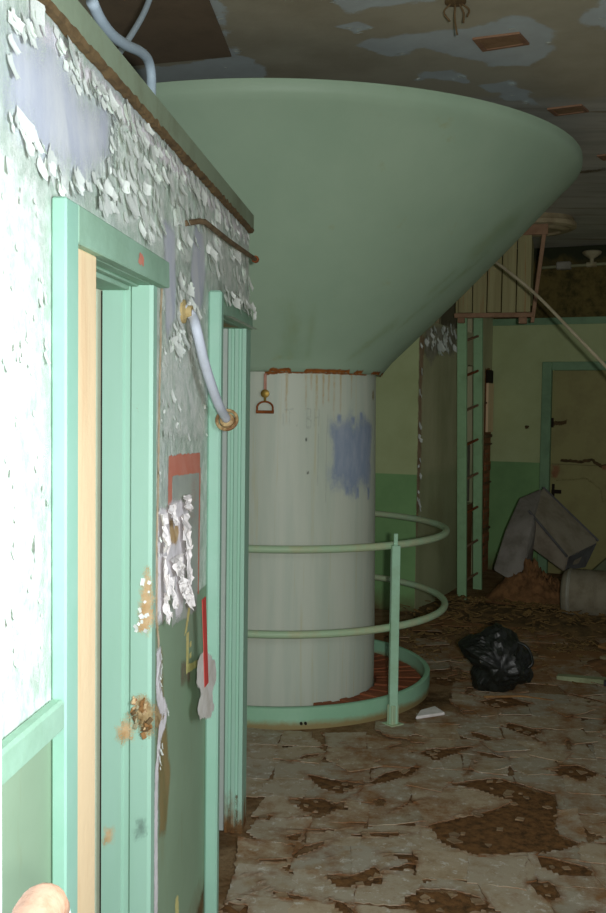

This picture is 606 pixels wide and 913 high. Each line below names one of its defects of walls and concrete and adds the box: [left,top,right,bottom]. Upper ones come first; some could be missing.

peeling [330,0,561,67]
flaking render [0,0,268,361]
rust [265,367,384,421]
peeling [416,323,457,536]
crack [556,458,606,501]
spalling [114,693,164,746]
peeling [423,733,498,760]
peeling [290,767,419,815]
peeling [548,767,596,782]
peeling [429,779,595,876]
peeling [328,868,383,889]
peeling [405,891,492,913]